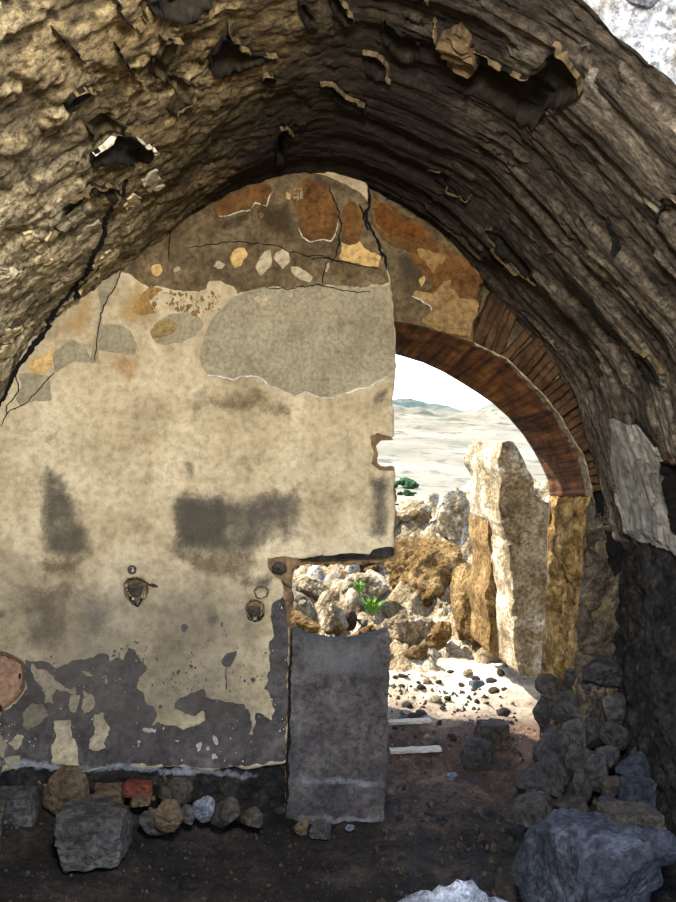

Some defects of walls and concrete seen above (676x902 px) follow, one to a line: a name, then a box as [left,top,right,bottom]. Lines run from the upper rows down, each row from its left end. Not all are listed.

flaking render [136,0,212,118]
flaking render [208,20,278,87]
flaking render [432,16,610,130]
peeling [0,266,24,295]
crack [0,179,129,427]
peeling [16,108,483,406]
crack [168,186,387,293]
leakage [42,471,86,573]
leakage [176,492,298,576]
flaking render [267,547,394,587]
peeling [593,418,676,577]
peeling [0,586,289,771]